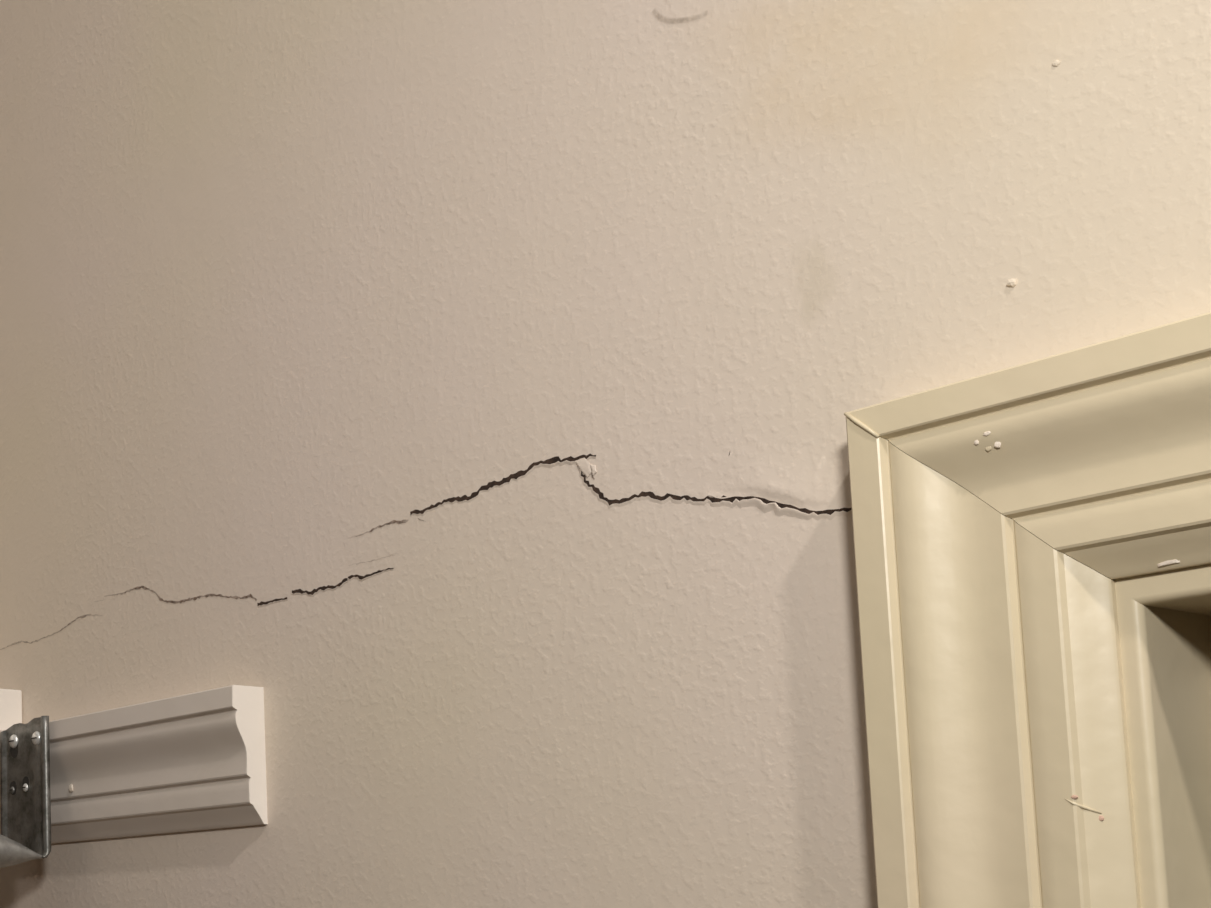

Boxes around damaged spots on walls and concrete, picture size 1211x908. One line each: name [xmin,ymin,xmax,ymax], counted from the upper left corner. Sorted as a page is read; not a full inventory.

crack [370,440,852,532]
crack [117,568,394,608]